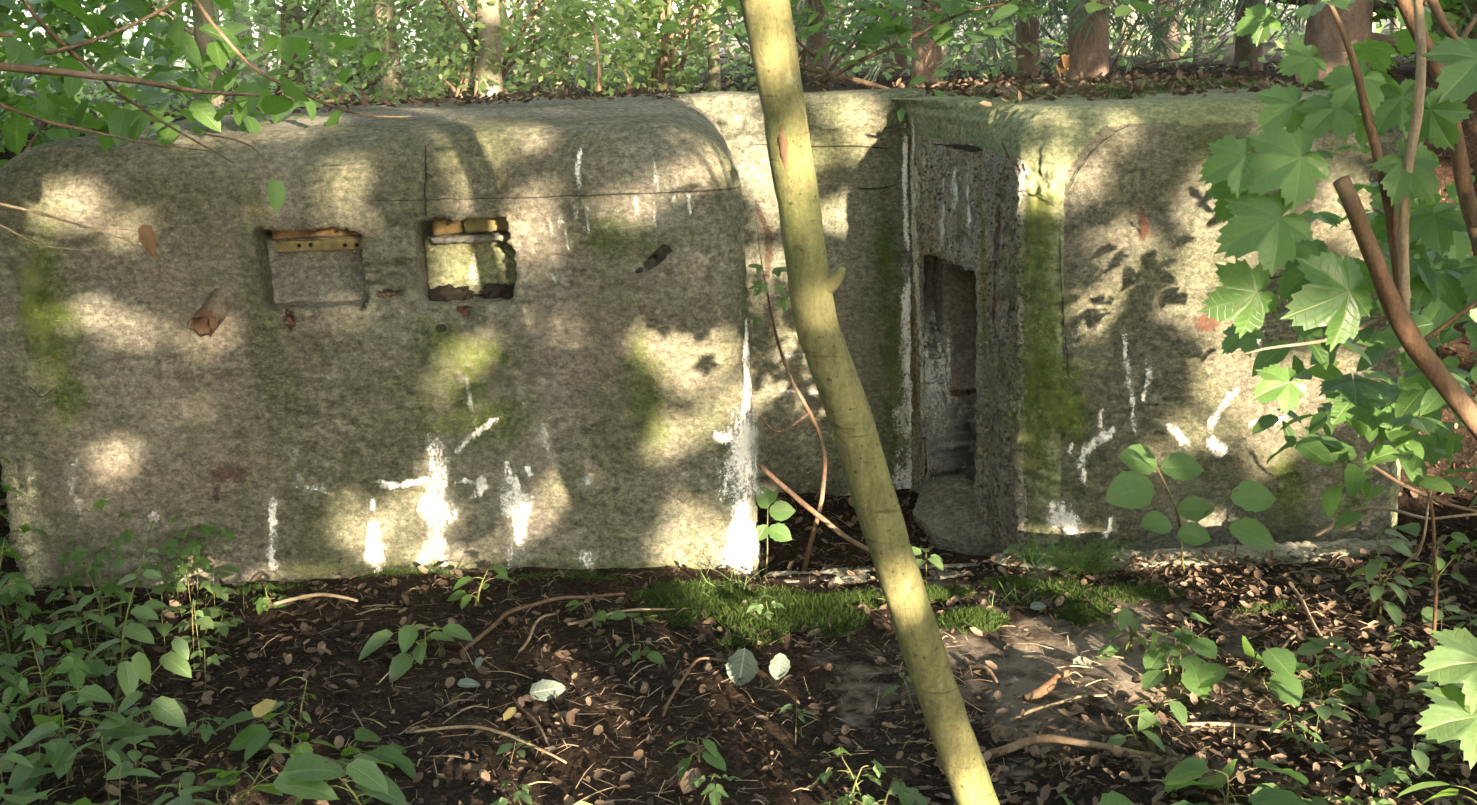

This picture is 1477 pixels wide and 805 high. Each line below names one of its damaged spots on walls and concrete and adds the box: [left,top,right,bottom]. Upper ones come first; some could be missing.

water stain [1122,333,1153,435]
water stain [364,379,534,573]
water stain [713,320,764,575]
water stain [1067,409,1115,483]
water stain [1166,424,1187,446]
water stain [1207,388,1236,457]
water stain [266,495,280,571]
water stain [578,550,594,569]
water stain [1046,500,1085,535]